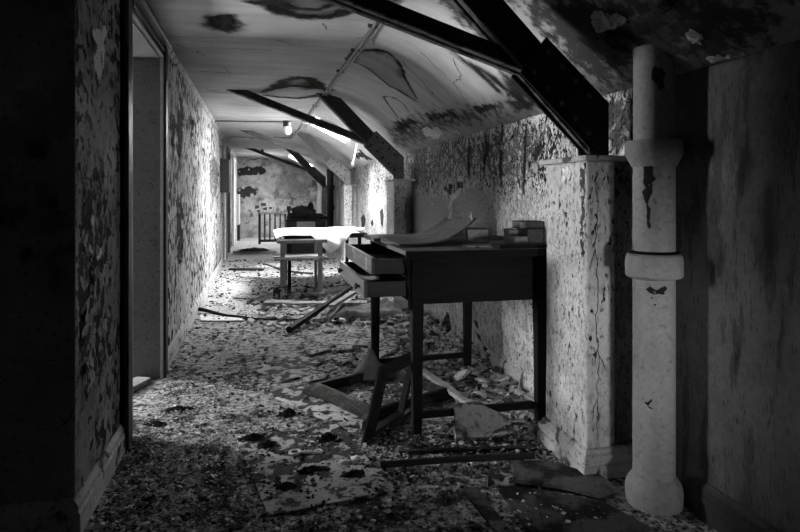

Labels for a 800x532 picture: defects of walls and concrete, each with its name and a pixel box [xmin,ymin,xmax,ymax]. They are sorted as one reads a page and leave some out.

peeling [92,25,107,80]
water stain [201,14,246,33]
water stain [244,0,352,20]
water stain [260,76,334,99]
peeling [170,98,199,167]
water stain [345,49,550,195]
spalling [237,165,272,212]
peeling [409,117,555,235]
peeling [642,166,656,229]
peeling [176,201,186,266]
crack [590,182,606,446]
peeling [646,286,667,306]